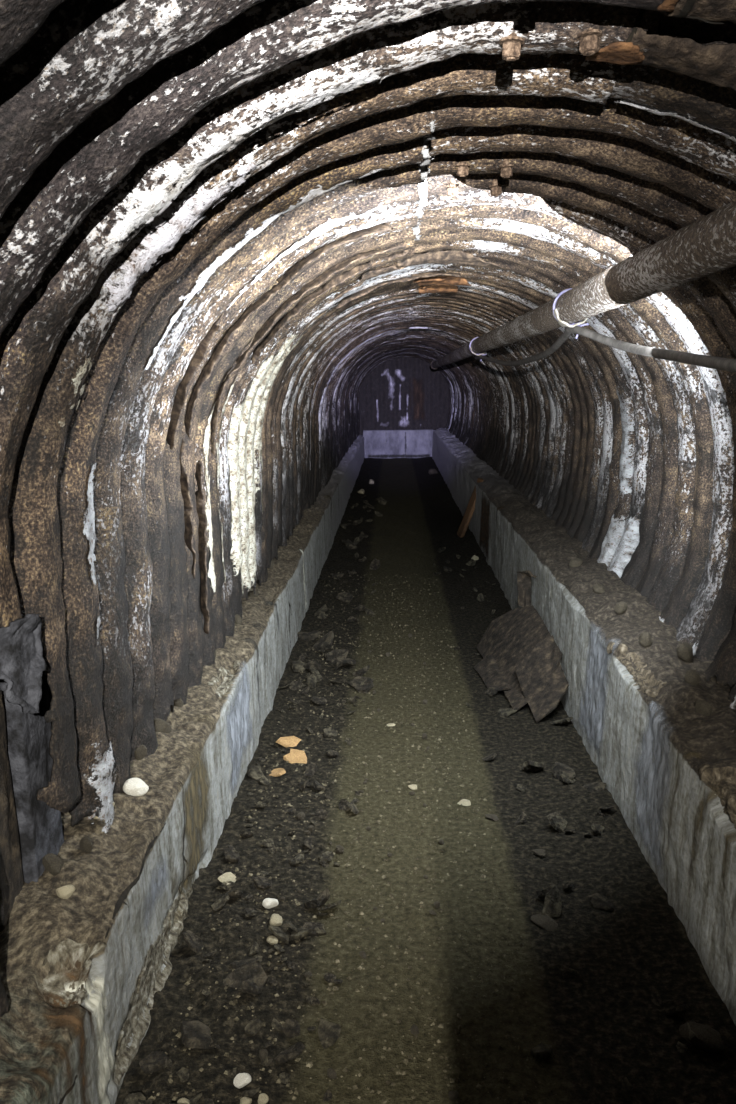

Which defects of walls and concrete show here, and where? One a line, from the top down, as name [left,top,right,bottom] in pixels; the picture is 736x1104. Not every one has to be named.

damp [412,120,435,241]
peeling [0,613,46,714]